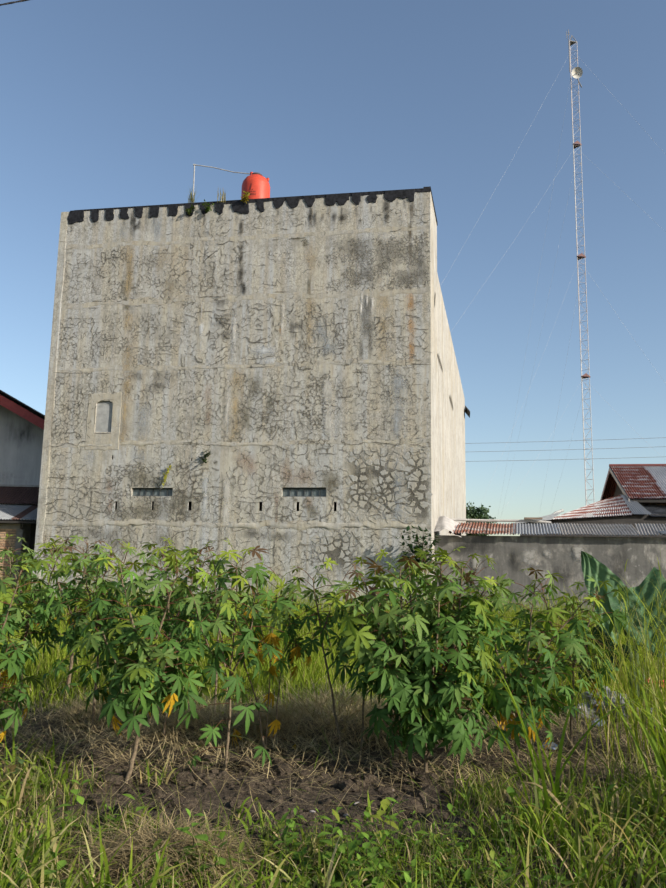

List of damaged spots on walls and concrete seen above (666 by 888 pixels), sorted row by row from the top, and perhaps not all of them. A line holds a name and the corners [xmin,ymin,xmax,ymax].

crack [43,207,453,582]